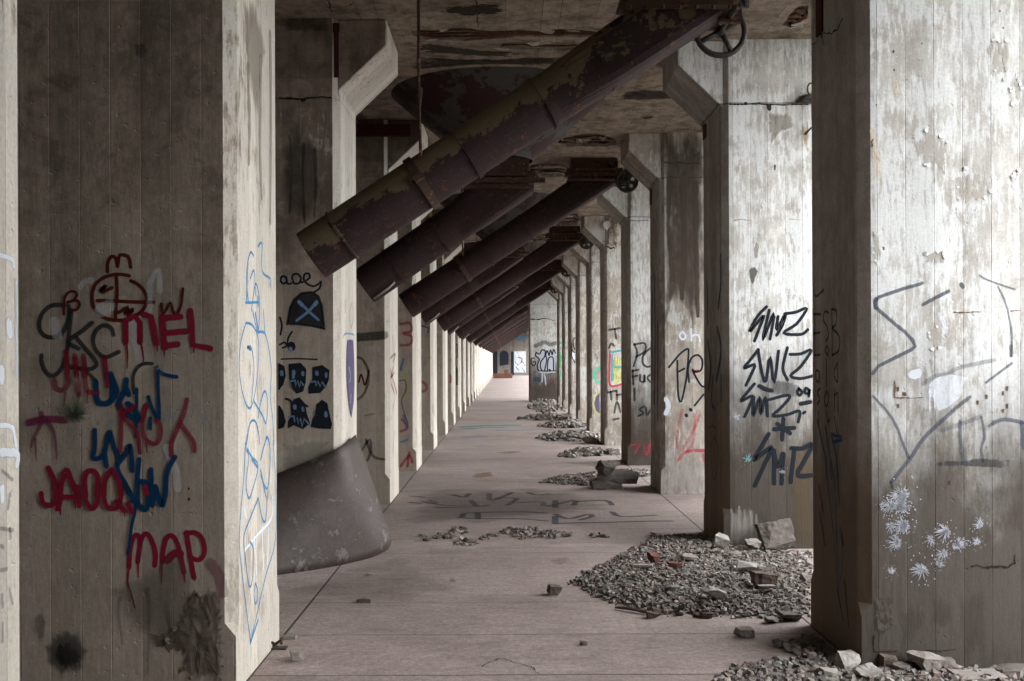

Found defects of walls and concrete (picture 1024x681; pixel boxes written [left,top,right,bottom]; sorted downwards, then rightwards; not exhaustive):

spalling [786,5,808,29]
crack [279,94,332,102]
damp [664,132,704,323]